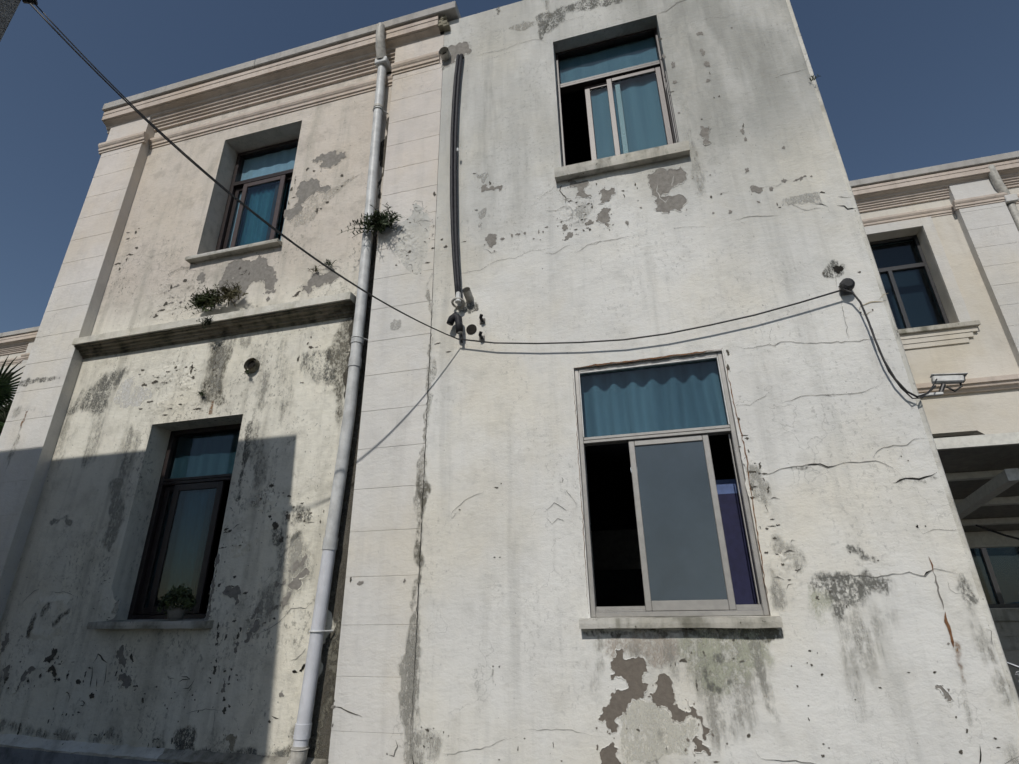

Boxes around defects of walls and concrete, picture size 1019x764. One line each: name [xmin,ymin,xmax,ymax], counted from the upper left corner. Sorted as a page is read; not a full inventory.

peeling [284,150,354,224]
peeling [477,180,629,253]
peeling [635,164,693,214]
peeling [218,255,278,305]
leakage [62,369,125,431]
leakage [104,427,138,551]
crack [756,438,935,483]
leakage [273,529,308,595]
leakage [810,571,888,619]
rust [929,558,962,667]
peeling [2,644,146,738]
peeling [596,648,720,764]